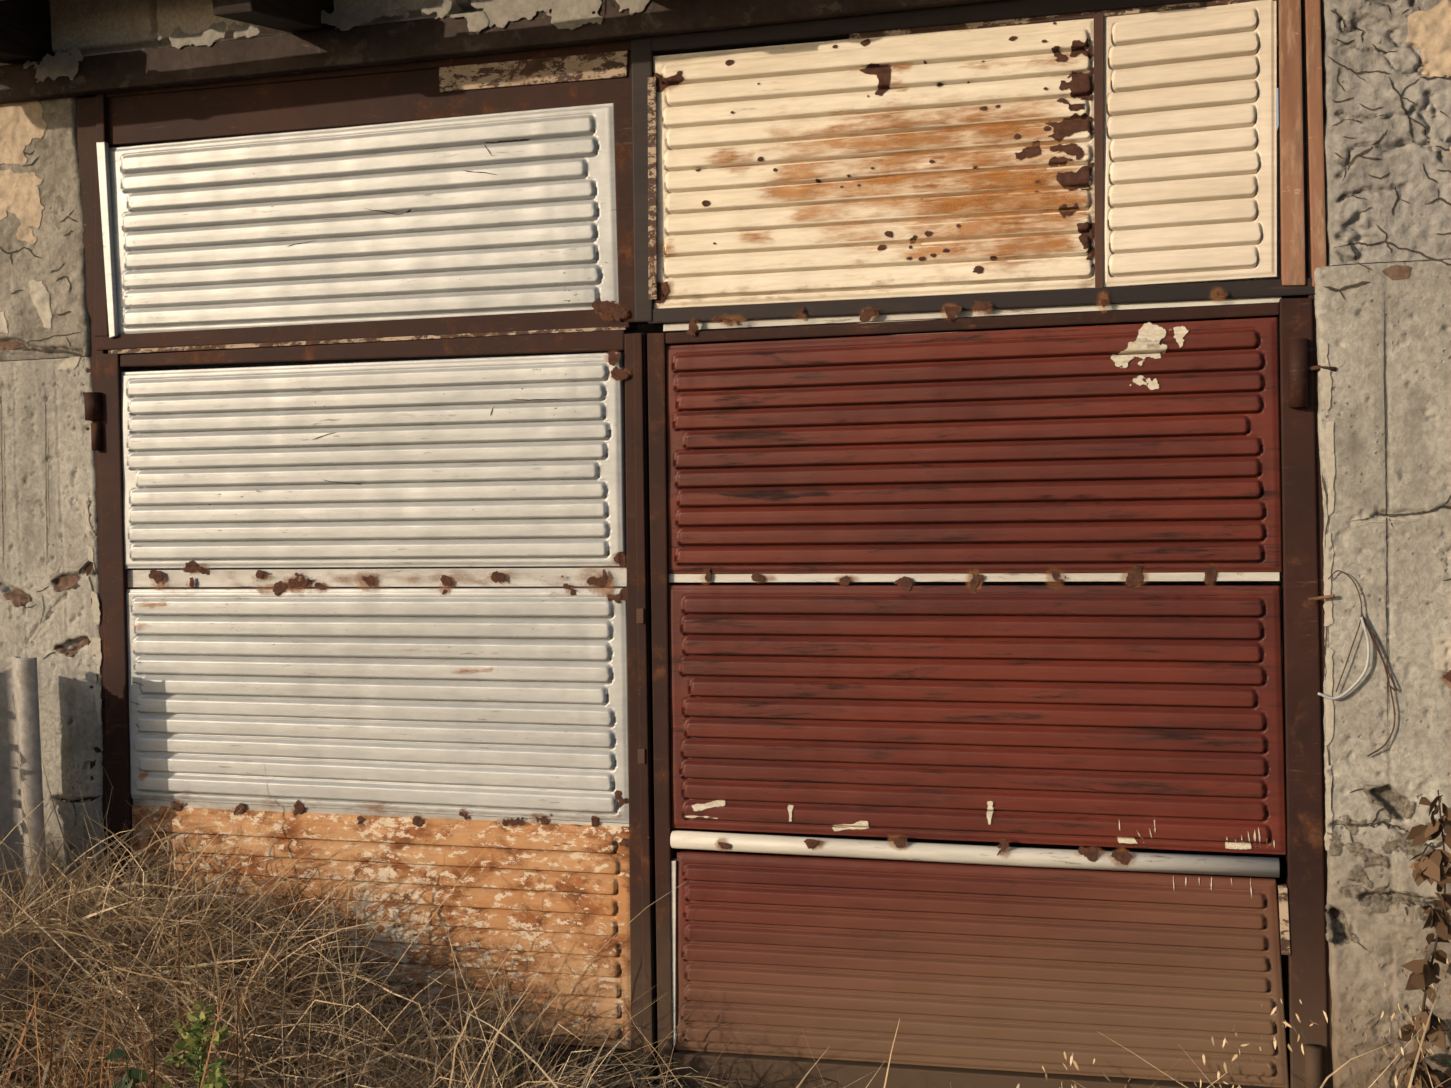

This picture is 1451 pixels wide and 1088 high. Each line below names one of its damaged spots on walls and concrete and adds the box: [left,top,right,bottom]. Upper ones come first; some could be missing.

corrosion [832,0,1278,48]
peeling [1405,0,1451,78]
peeling [0,101,47,244]
corrosion [696,105,1088,264]
peeling [1111,322,1189,390]
corrosion [183,560,206,587]
corrosion [255,570,376,596]
corrosion [491,571,505,583]
corrosion [561,551,627,603]
spalling [0,497,102,726]
corrosion [502,814,552,827]
spalling [1325,904,1368,951]